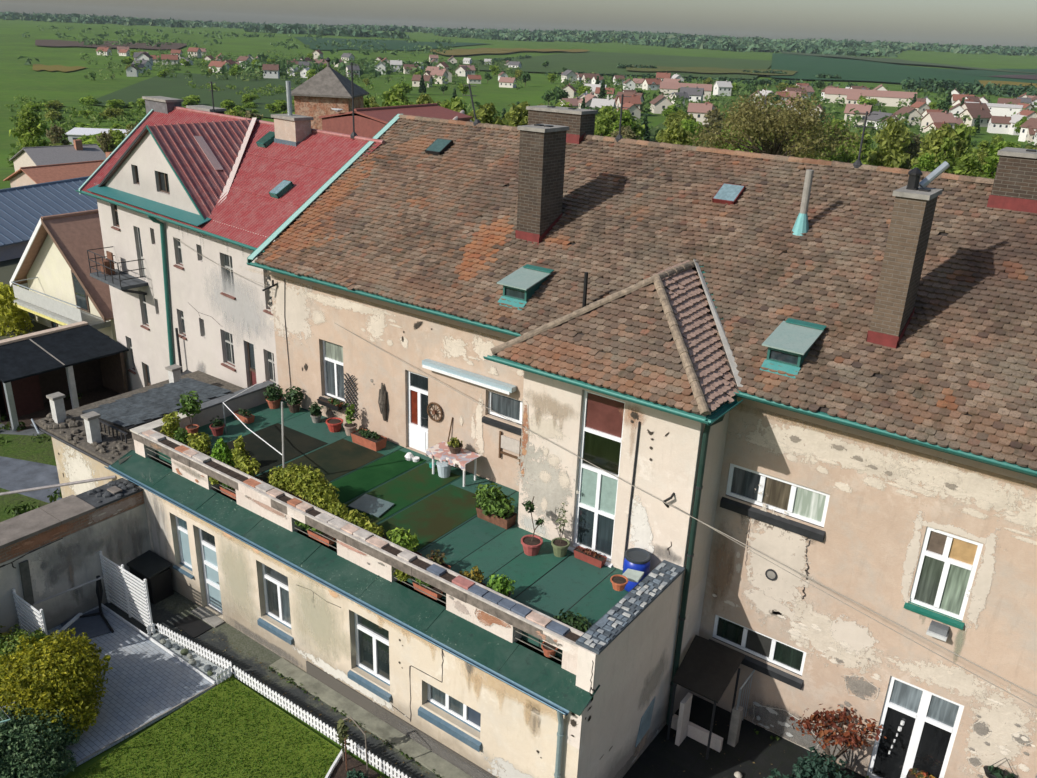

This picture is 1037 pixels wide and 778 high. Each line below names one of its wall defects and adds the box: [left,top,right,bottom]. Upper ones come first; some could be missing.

peeling [295,291,432,351]
peeling [440,335,524,376]
crack [0,538,63,568]
crack [802,537,811,599]
peeling [730,417,1037,631]
flaking render [449,596,510,628]
crack [392,649,444,722]
peeling [712,581,1037,778]